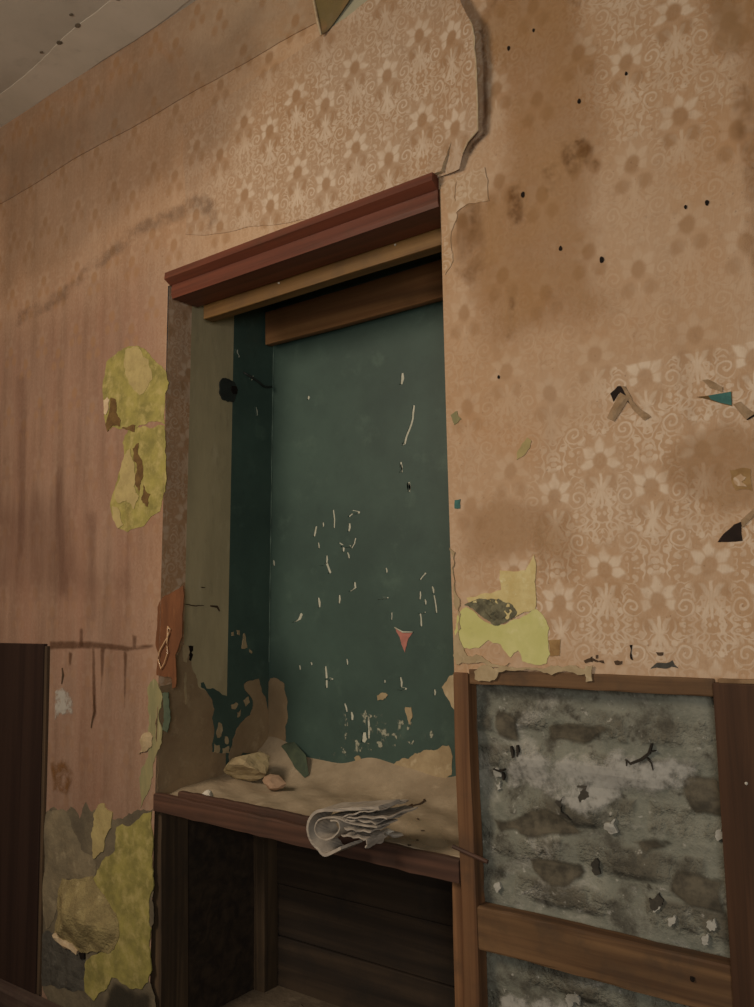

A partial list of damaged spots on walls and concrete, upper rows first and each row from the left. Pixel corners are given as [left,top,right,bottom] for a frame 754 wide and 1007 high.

peeling [102,346,169,532]
peeling [454,556,550,665]
flaking render [41,643,288,1007]
peeling [333,707,453,778]